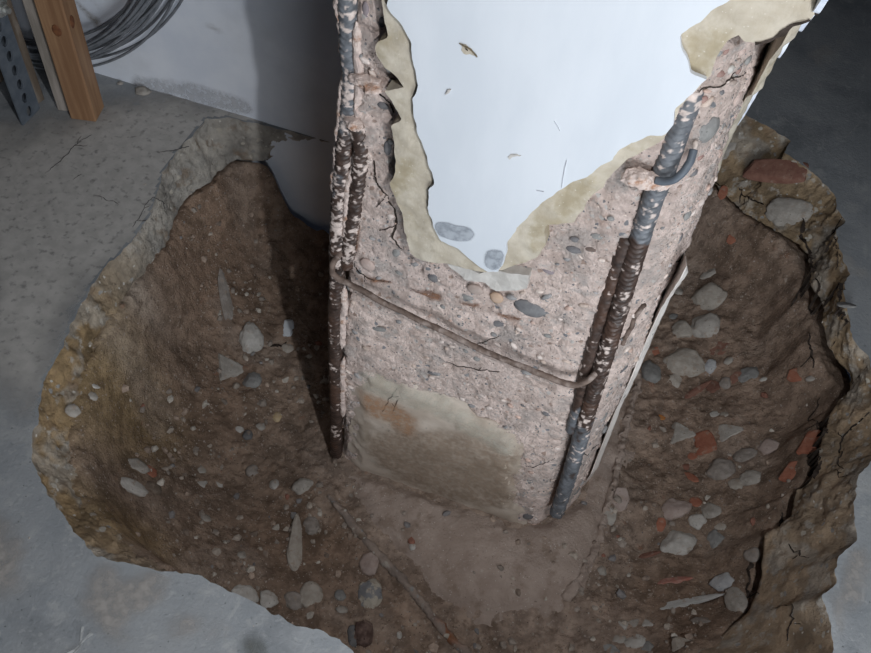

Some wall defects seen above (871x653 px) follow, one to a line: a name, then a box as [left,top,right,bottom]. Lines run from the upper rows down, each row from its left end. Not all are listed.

spalling [31,117,327,574]
corrosion [416,291,441,300]
spalling [327,0,871,653]
crack [791,217,867,387]
crack [800,398,870,489]
crack [745,562,759,599]
crack [776,604,800,641]
crack [778,512,808,559]